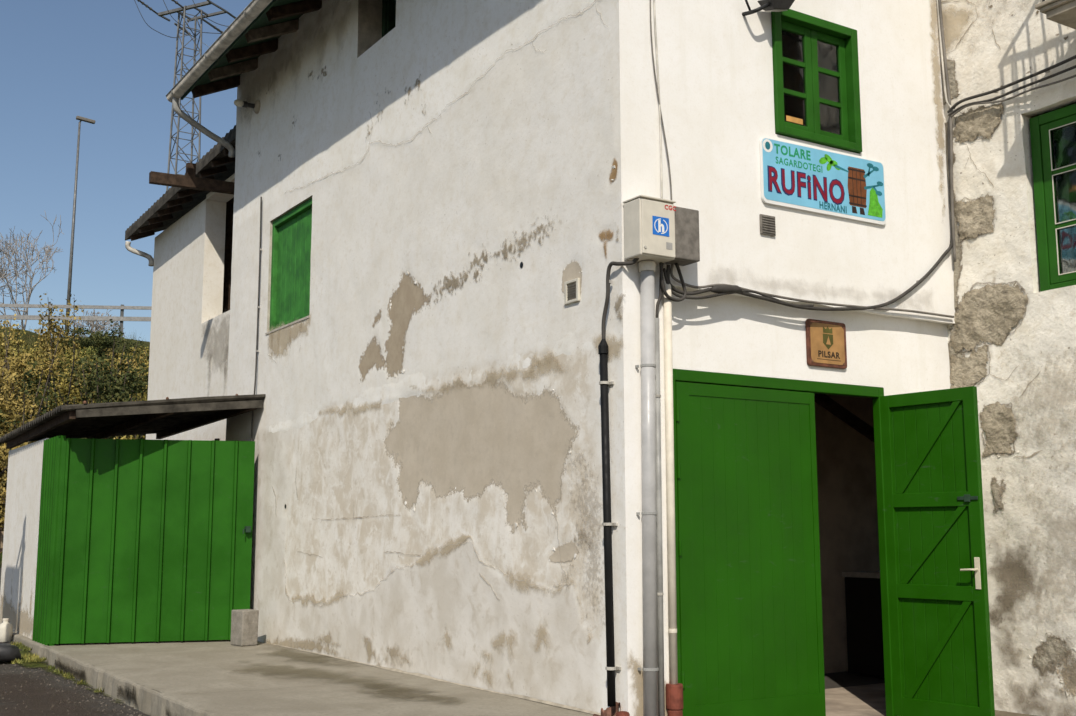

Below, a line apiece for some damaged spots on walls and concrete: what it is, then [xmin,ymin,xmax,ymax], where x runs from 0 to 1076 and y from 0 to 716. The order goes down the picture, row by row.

crack [285,1,605,193]
spalling [609,159,617,182]
flaking render [941,59,1028,389]
peeling [359,271,432,384]
peeling [384,378,578,533]
peeling [549,542,579,563]
spalling [1027,635,1076,696]